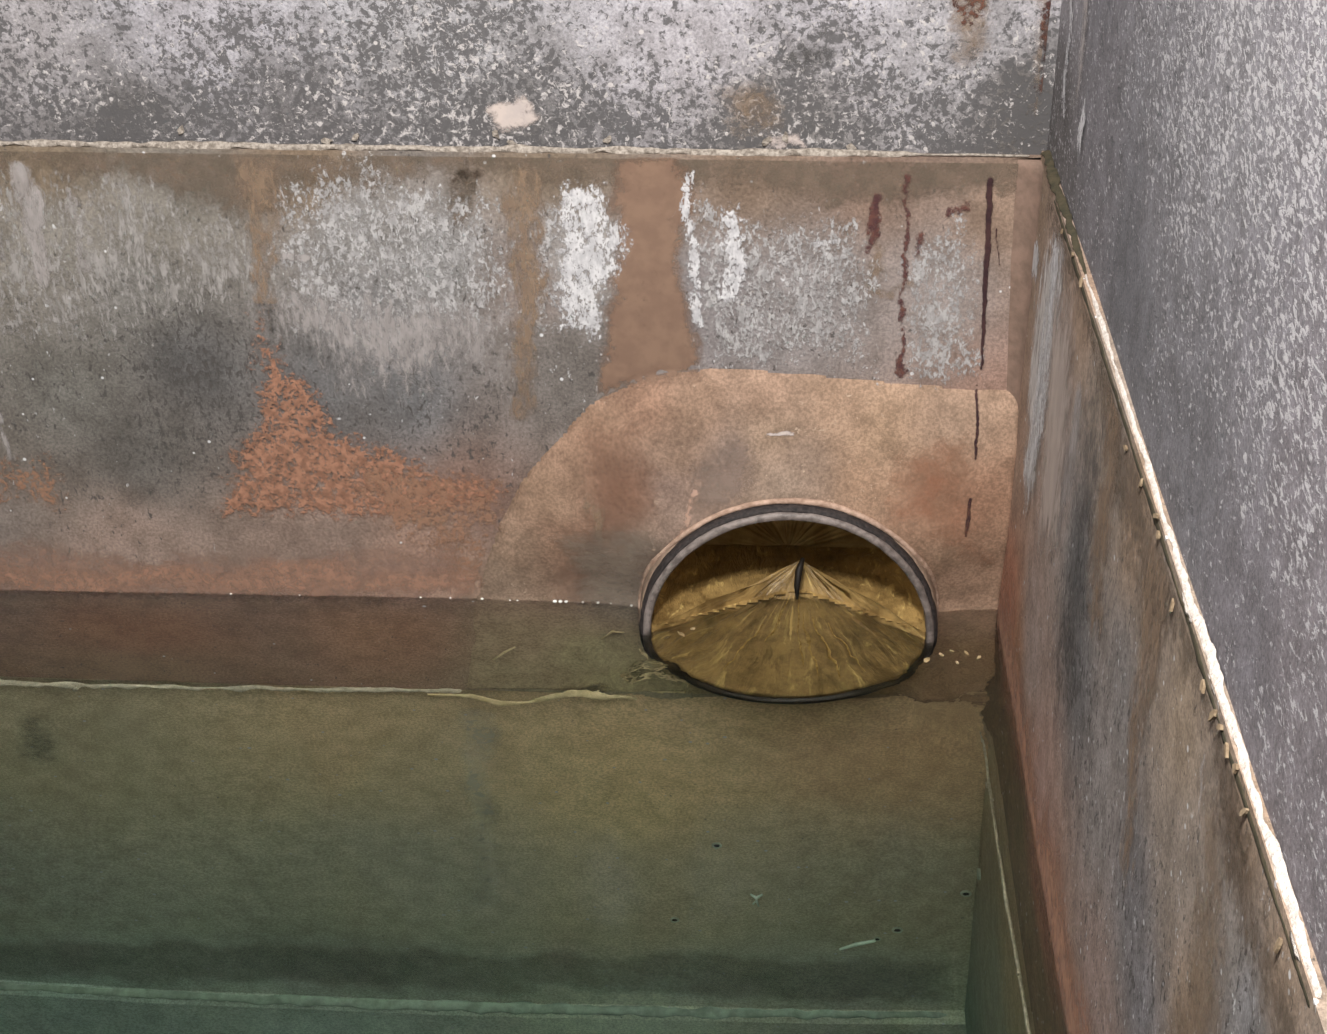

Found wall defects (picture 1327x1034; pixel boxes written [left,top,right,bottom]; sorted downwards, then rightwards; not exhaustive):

rust [952,0,985,26]
rust [1034,0,1051,95]
rust [865,193,882,254]
rust [946,201,970,217]
damp [0,151,1019,418]
rust [894,174,924,377]
rust [213,311,509,591]